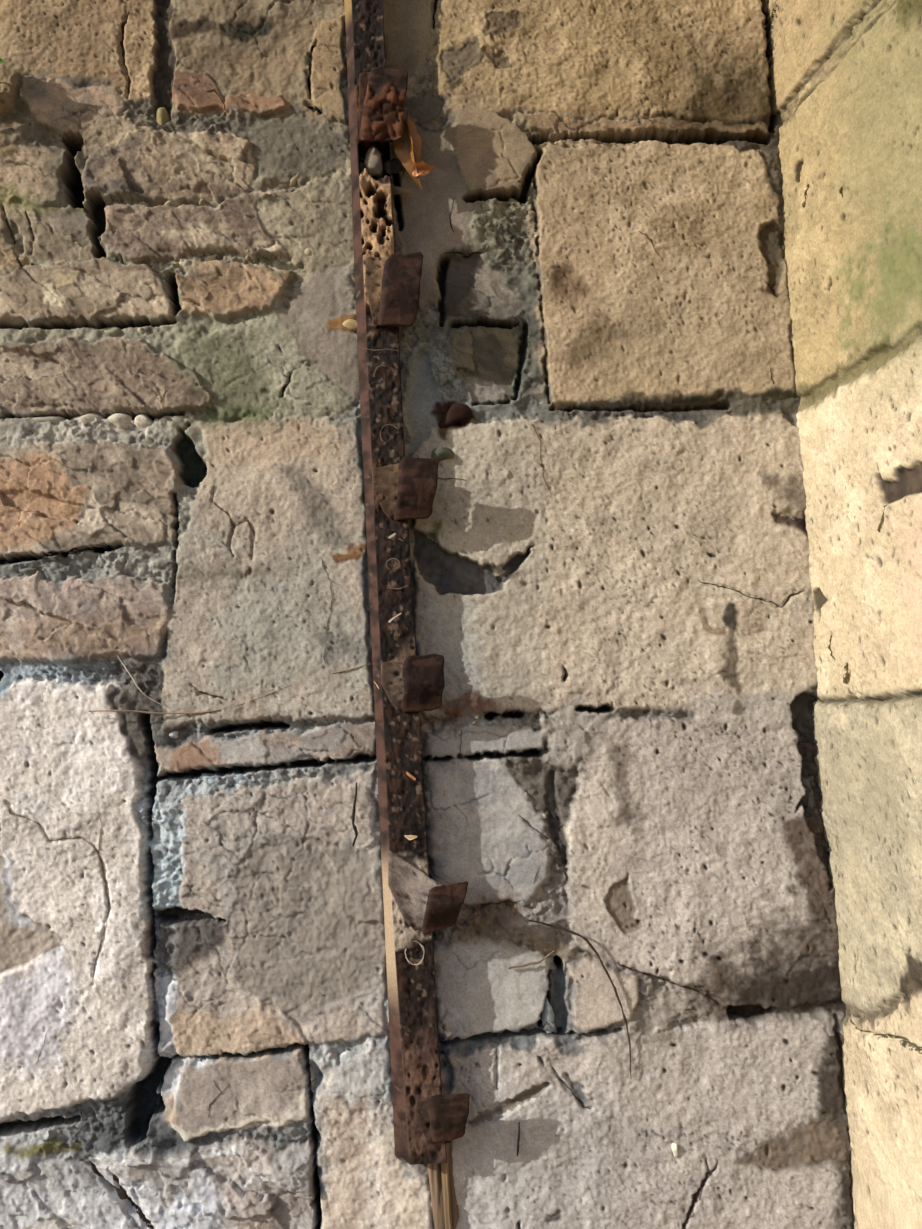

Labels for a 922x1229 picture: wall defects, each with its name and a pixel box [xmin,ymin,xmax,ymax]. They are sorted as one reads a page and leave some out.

spalling [759,221,786,296]
corrosion [432,401,474,439]
spalling [878,463,922,503]
spalling [413,531,530,595]
spalling [0,850,61,972]
crack [91,1163,154,1229]
crack [681,1157,718,1229]